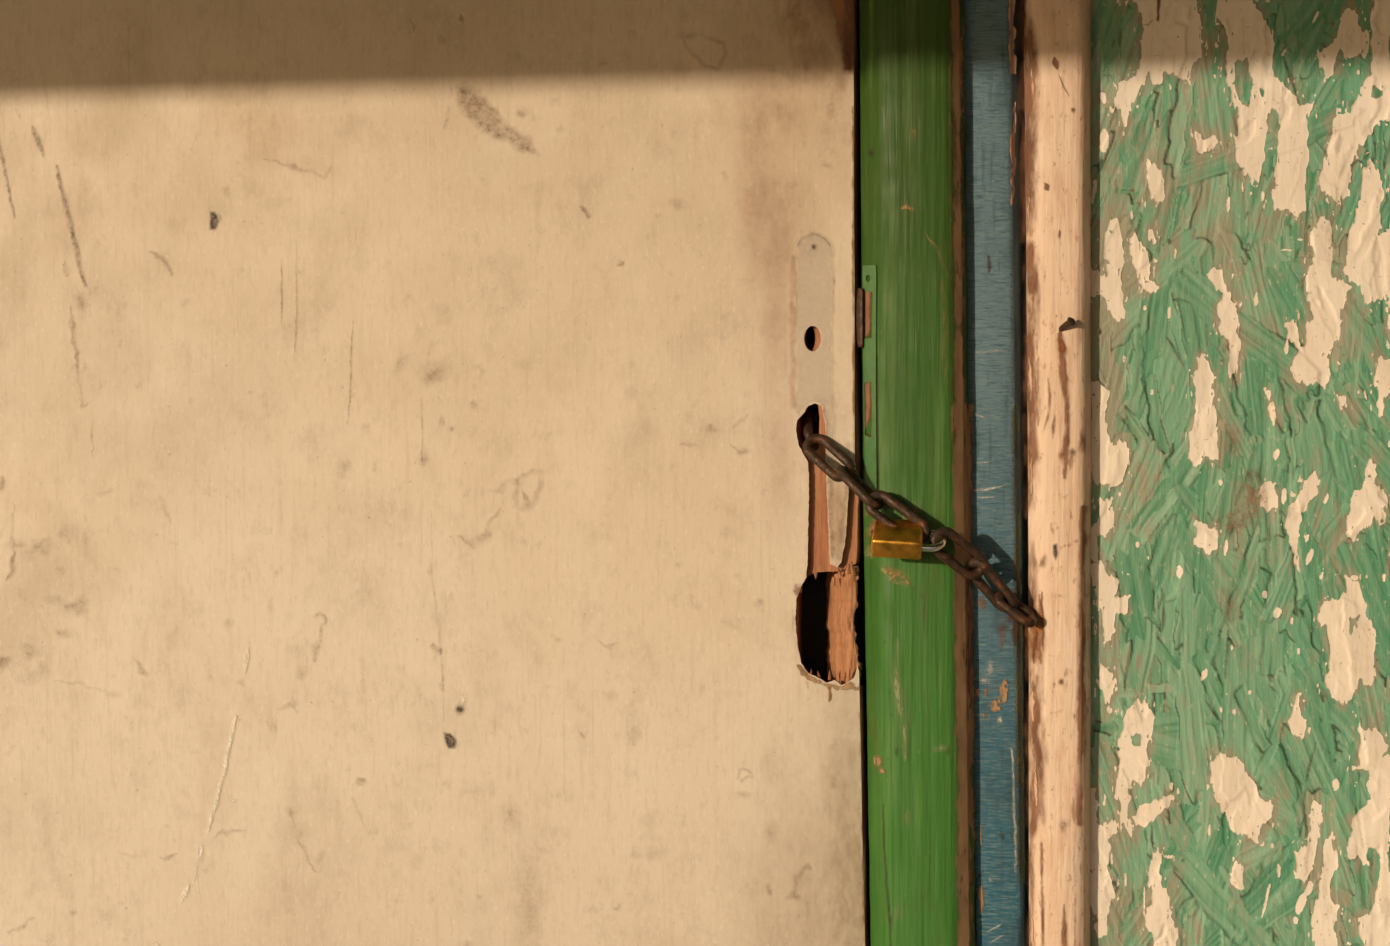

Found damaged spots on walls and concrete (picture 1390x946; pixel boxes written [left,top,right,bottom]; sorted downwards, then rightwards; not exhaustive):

peeling [1099,0,1390,417]
peeling [1008,0,1180,946]
peeling [1193,520,1228,556]
peeling [1185,265,1259,486]
peeling [1263,387,1276,426]
peeling [1346,458,1389,542]
peeling [1207,471,1390,946]